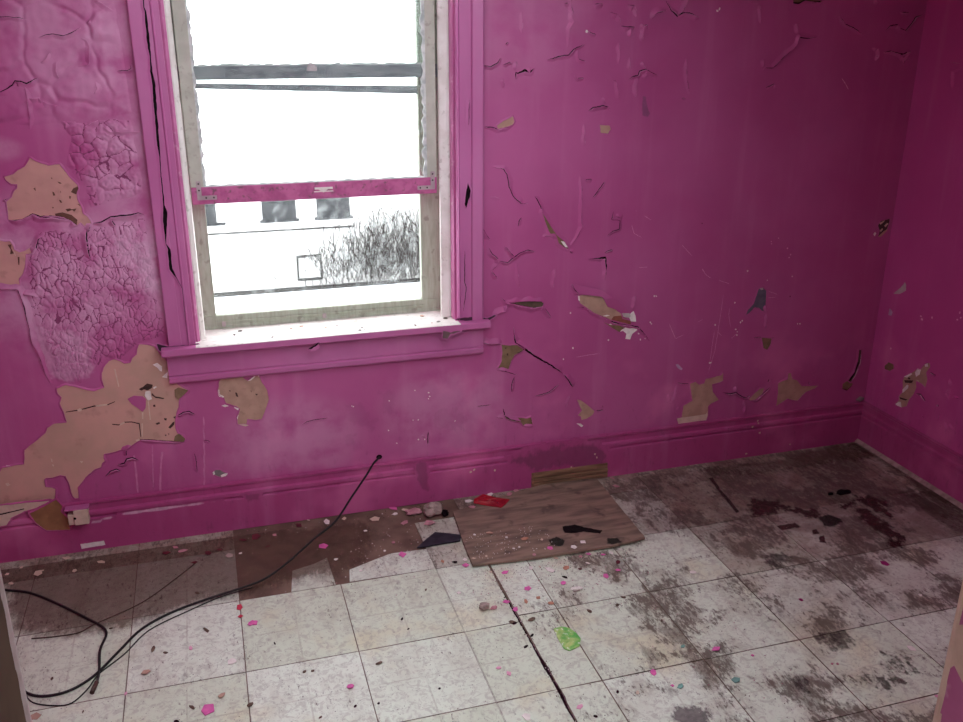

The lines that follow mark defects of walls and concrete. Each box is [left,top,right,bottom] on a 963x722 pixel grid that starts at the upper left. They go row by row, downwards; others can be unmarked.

peeling [3,156,93,231]
crack [0,0,189,345]
peeling [0,238,37,291]
peeling [572,284,637,339]
peeling [497,343,525,372]
peeling [216,375,270,426]
peeling [676,371,724,424]
peeling [0,343,190,531]
water stain [709,478,906,548]
peeling [79,539,107,550]
water stain [765,552,788,567]
spalling [0,569,41,722]